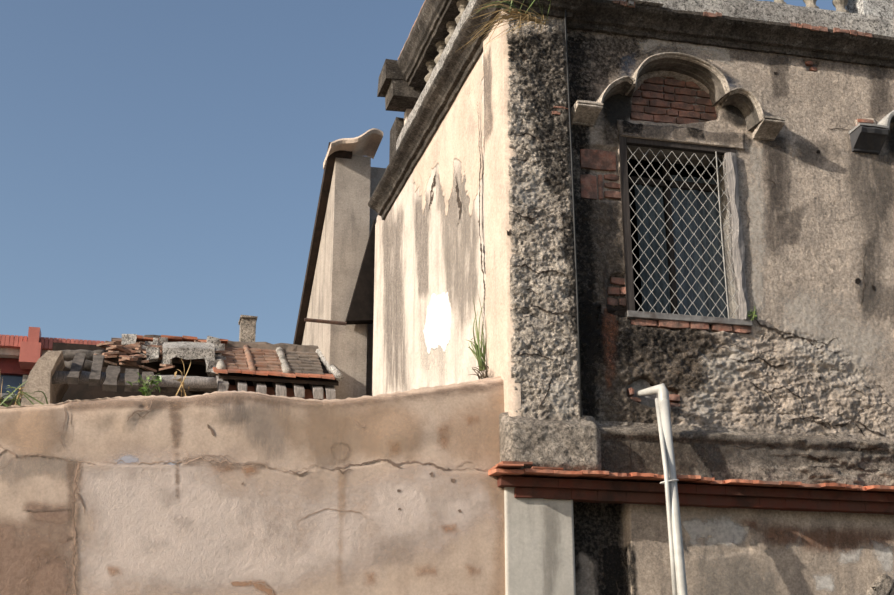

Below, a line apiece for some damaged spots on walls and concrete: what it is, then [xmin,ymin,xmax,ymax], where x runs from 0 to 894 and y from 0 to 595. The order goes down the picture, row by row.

flaking render [630,76,717,124]
peeling [423,292,451,355]
crack [429,105,486,347]
crack [512,348,557,407]
crack [507,133,568,236]
crack [511,264,568,324]
flaking render [580,149,621,200]
leakage [507,29,833,477]
spalling [669,394,680,407]
crack [707,317,893,472]
leakage [784,295,885,385]
crack [0,406,487,595]